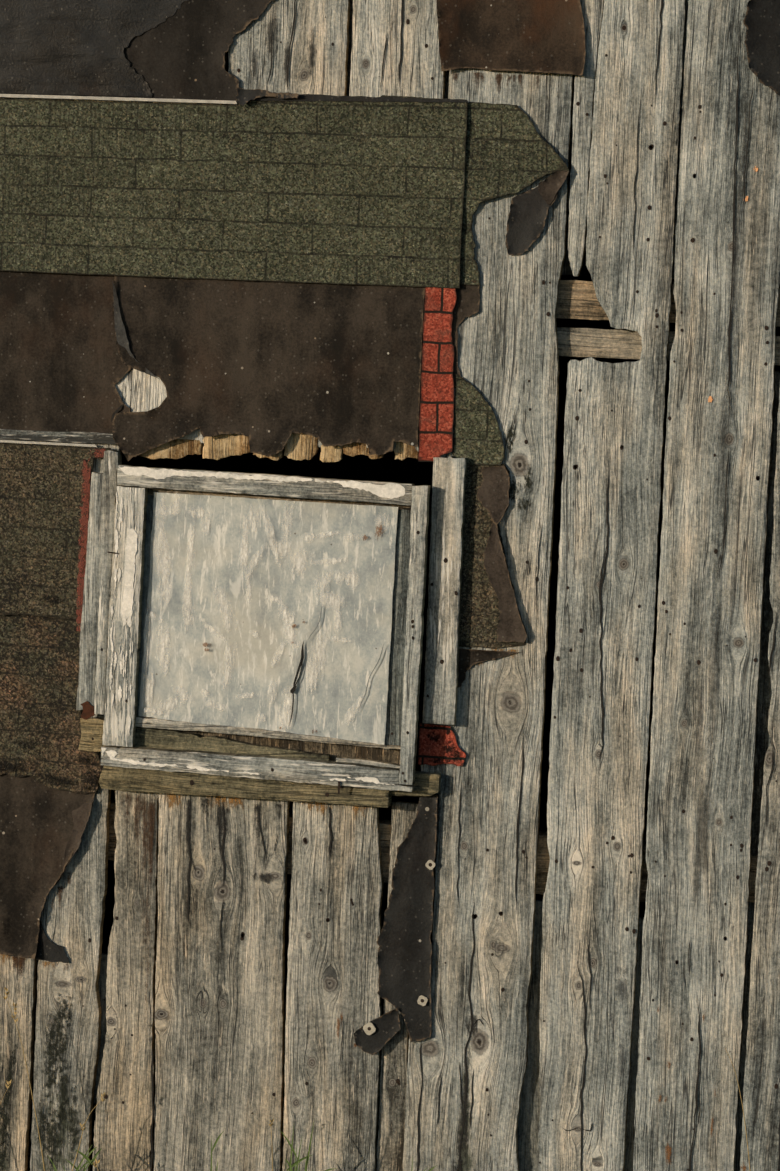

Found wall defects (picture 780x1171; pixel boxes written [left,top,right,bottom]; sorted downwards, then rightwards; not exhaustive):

crack [289,607,322,725]
crack [599,463,609,771]